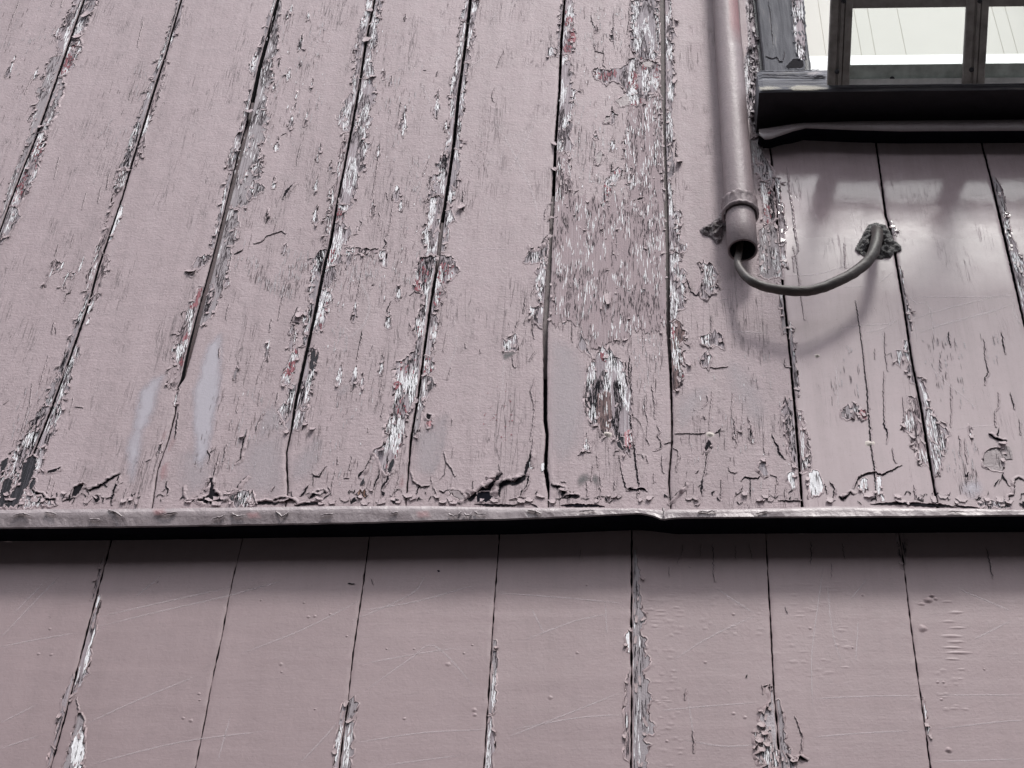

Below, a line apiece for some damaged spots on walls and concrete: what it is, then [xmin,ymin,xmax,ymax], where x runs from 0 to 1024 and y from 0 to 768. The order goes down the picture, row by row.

peeling [0,0,186,510]
peeling [164,0,314,406]
peeling [275,0,393,434]
peeling [332,695,361,768]
peeling [306,0,481,505]
crack [2,0,1024,520]
peeling [522,0,726,458]
peeling [621,549,658,768]
peeling [751,684,799,768]
peeling [732,0,844,505]
peeling [892,266,952,478]
peeling [855,441,1024,510]